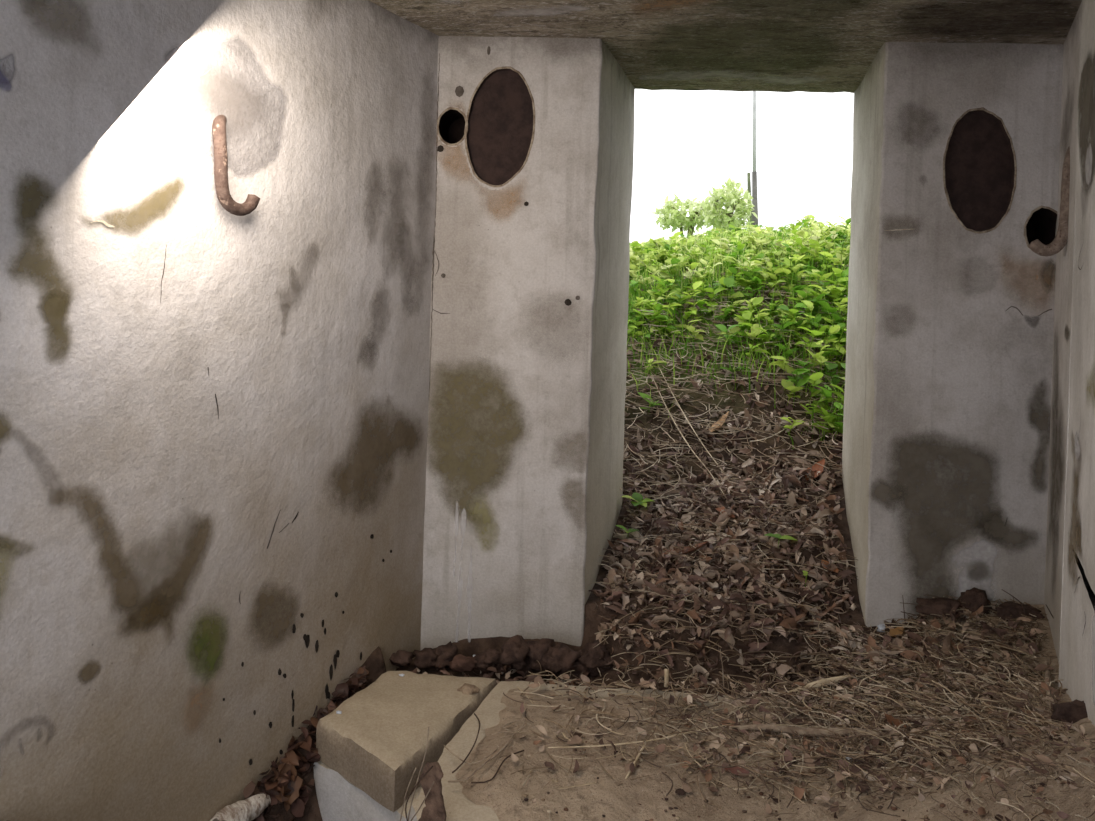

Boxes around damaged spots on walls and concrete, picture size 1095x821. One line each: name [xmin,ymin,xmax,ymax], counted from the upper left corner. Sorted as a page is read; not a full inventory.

leakage [1078,55,1095,189]
leakage [10,178,70,358]
leakage [91,179,182,232]
leakage [0,417,10,441]
leakage [56,490,211,630]
leakage [333,411,418,509]
leakage [430,367,524,548]
leakage [872,436,1035,611]
crack [1074,553,1095,636]
leakage [325,650,340,699]